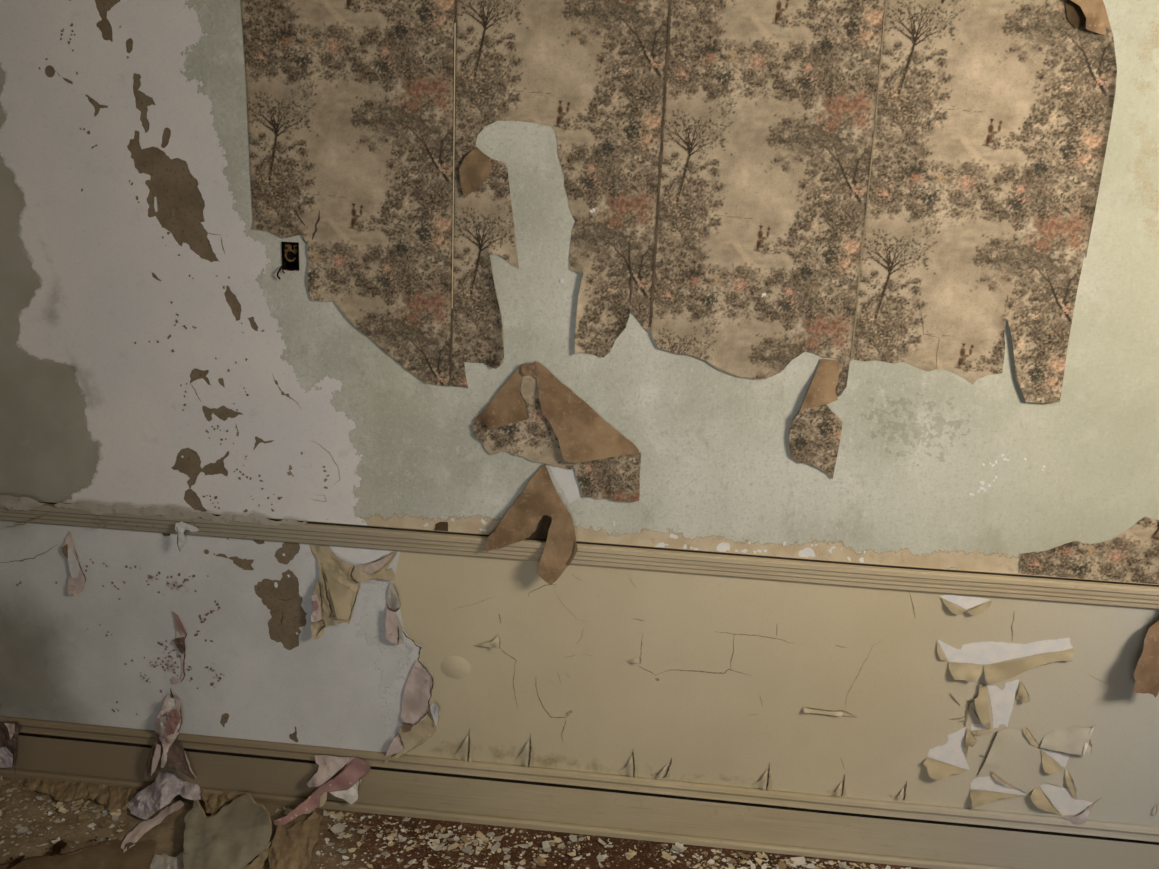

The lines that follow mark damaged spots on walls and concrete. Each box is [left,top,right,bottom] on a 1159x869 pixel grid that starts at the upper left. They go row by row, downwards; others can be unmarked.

peeling [0,0,440,762]
peeling [549,465,581,503]
peeling [655,534,698,550]
peeling [716,541,767,554]
peeling [798,543,866,563]
peeling [940,594,992,616]
crack [452,573,591,743]
crack [636,619,789,715]
peeling [923,638,1102,824]